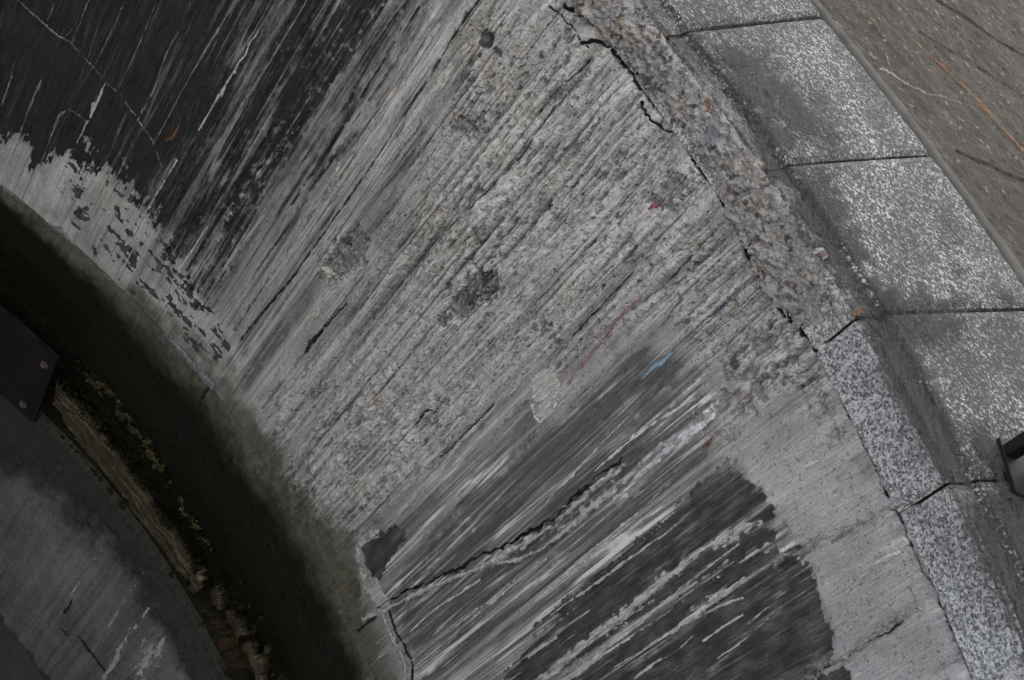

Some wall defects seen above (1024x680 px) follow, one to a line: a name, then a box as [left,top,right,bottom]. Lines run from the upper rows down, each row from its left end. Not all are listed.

crack [549,4,674,133]
crack [691,155,725,207]
peeling [157,327,215,390]
crack [777,308,818,354]
leakage [0,393,230,680]
peeling [354,515,396,609]
crack [357,457,625,680]